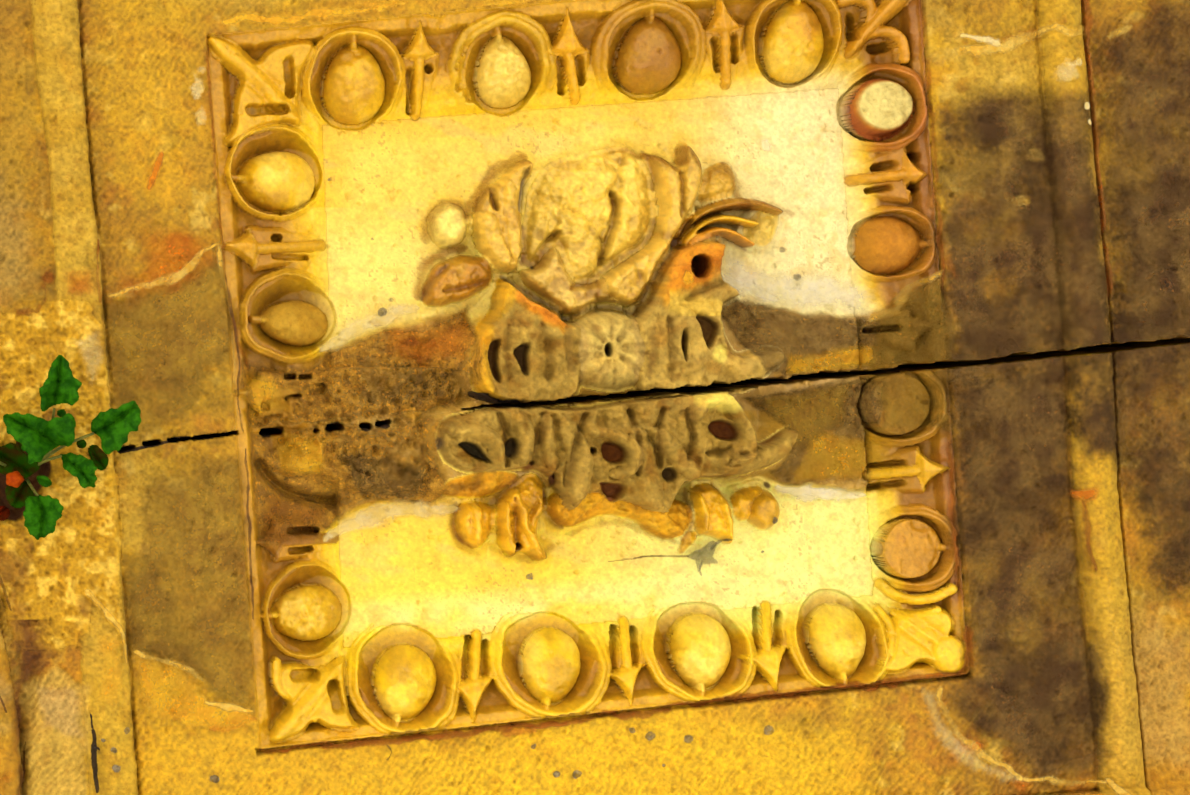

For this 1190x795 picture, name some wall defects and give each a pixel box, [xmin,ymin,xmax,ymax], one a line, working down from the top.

crack [1000,339,1183,358]
crack [468,362,969,408]
water stain [721,3,1190,778]